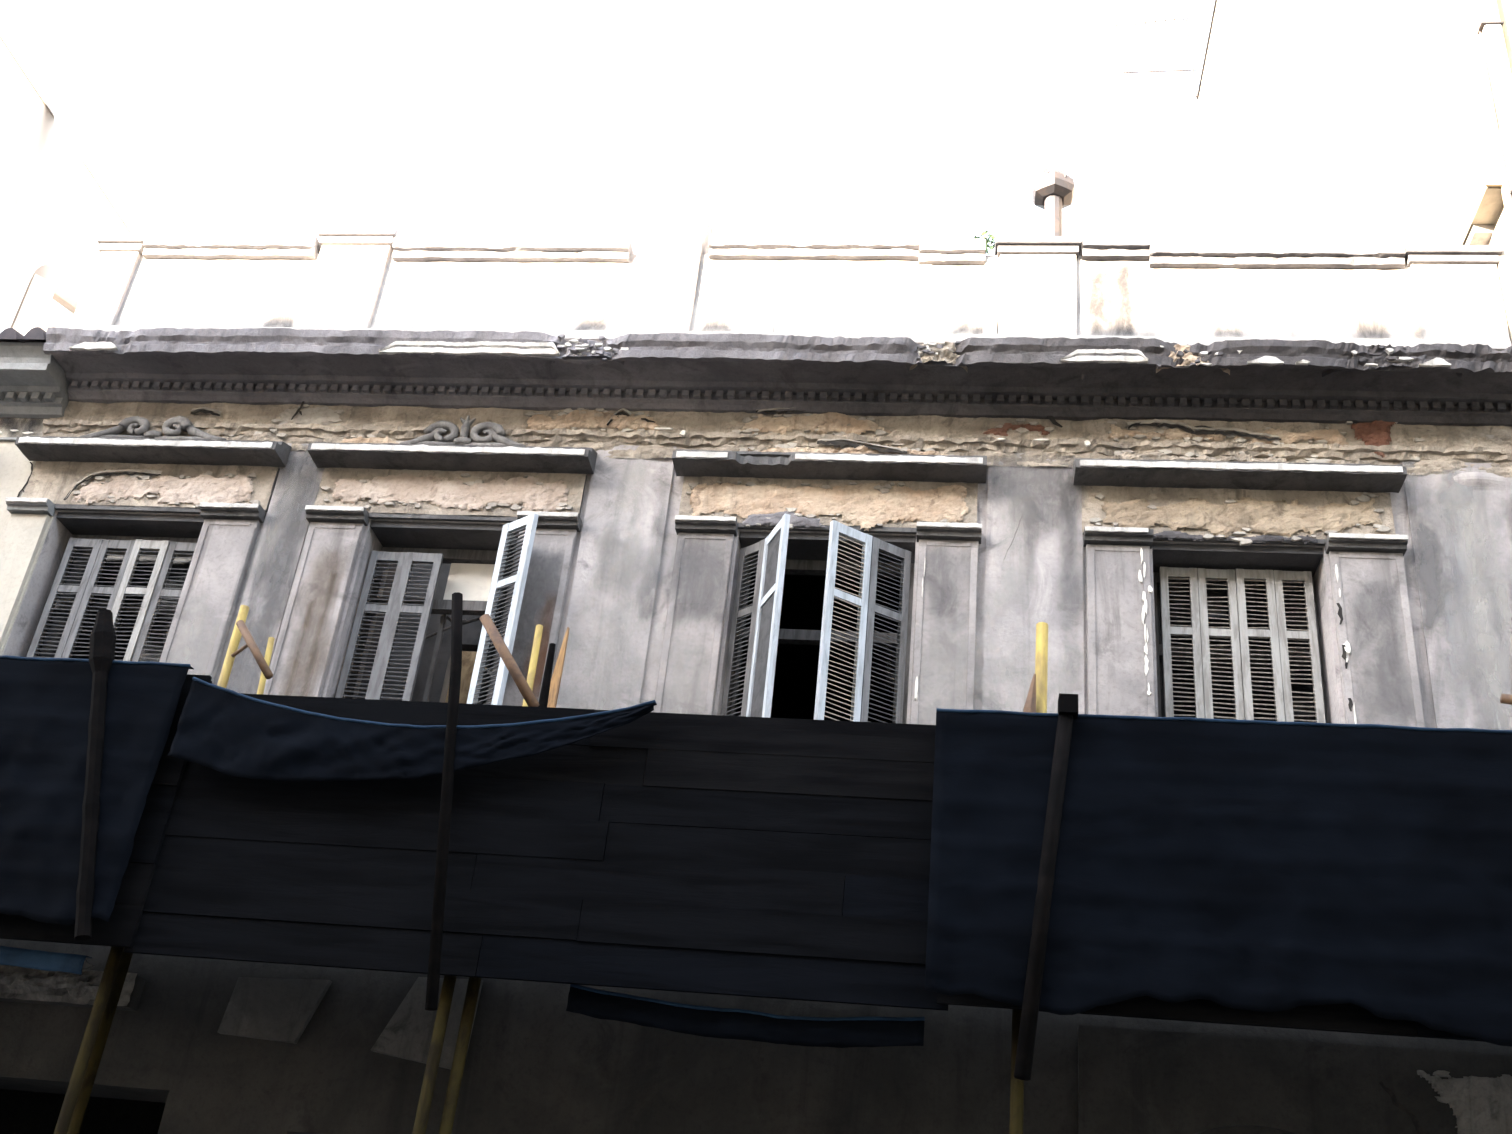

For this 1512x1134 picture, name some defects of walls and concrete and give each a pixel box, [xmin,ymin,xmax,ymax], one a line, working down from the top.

leakage [577,304,610,330]
leakage [1086,261,1133,336]
leakage [1355,287,1389,337]
spalling [218,404,404,444]
spalling [524,408,686,436]
spalling [732,412,953,455]
spalling [1084,420,1398,464]
spalling [71,470,260,508]
spalling [321,472,573,512]
spalling [686,481,968,531]
spalling [1088,492,1390,696]
spalling [1417,1070,1512,1134]